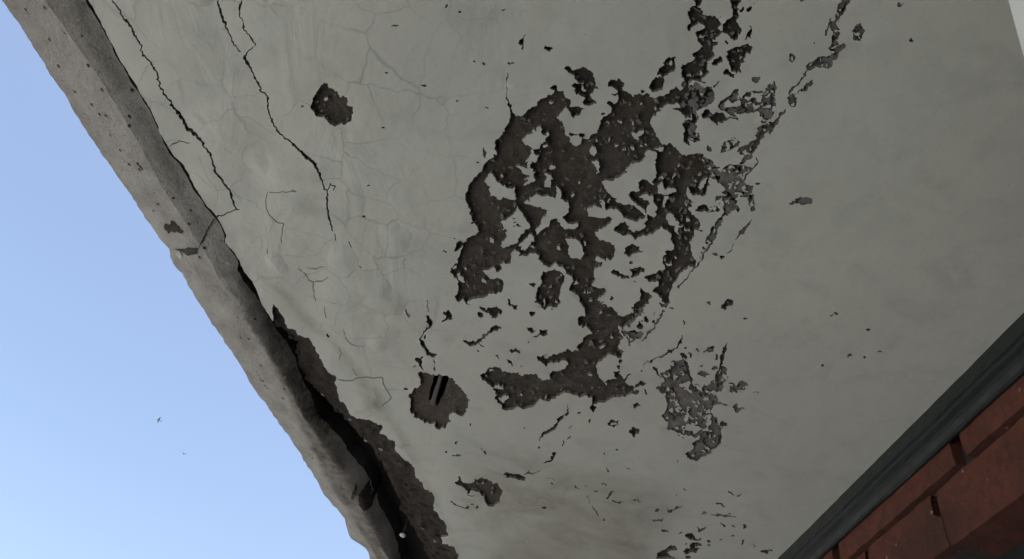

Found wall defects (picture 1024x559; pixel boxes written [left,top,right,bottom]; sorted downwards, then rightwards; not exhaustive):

spalling [302,83,353,124]
crack [265,190,297,255]
spalling [452,0,865,420]
spalling [274,306,459,559]
spalling [410,356,471,427]
peeling [653,344,748,459]
spalling [457,477,503,508]